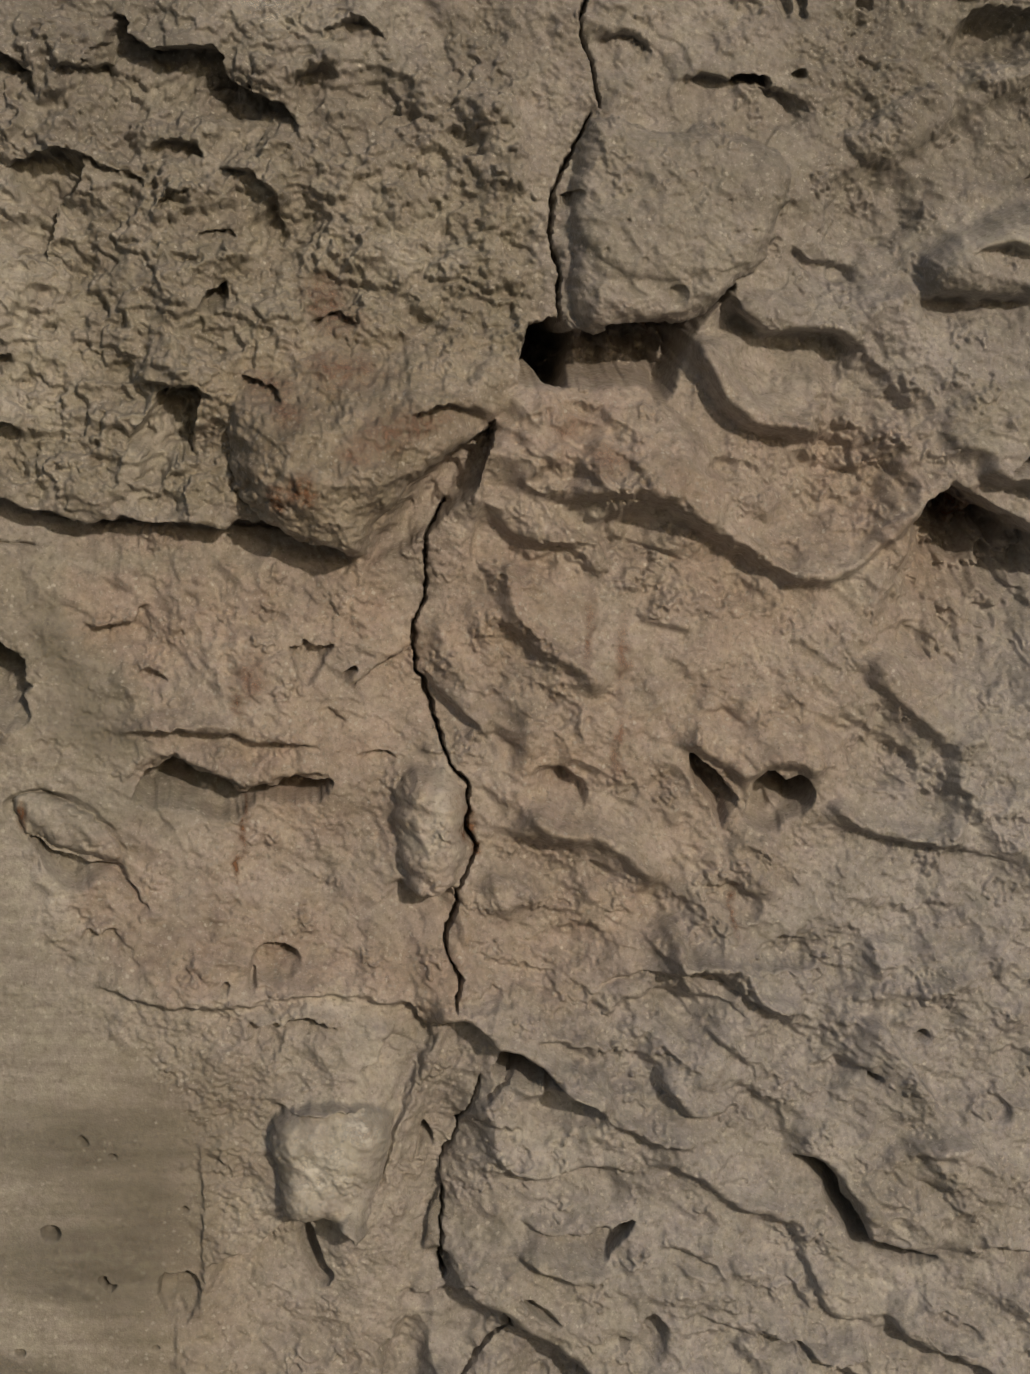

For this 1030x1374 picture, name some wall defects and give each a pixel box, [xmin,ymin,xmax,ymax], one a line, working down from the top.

crack [546,0,602,331]
crack [488,420,497,450]
crack [354,498,479,1015]
crack [436,1053,518,1278]
crack [461,1317,516,1374]